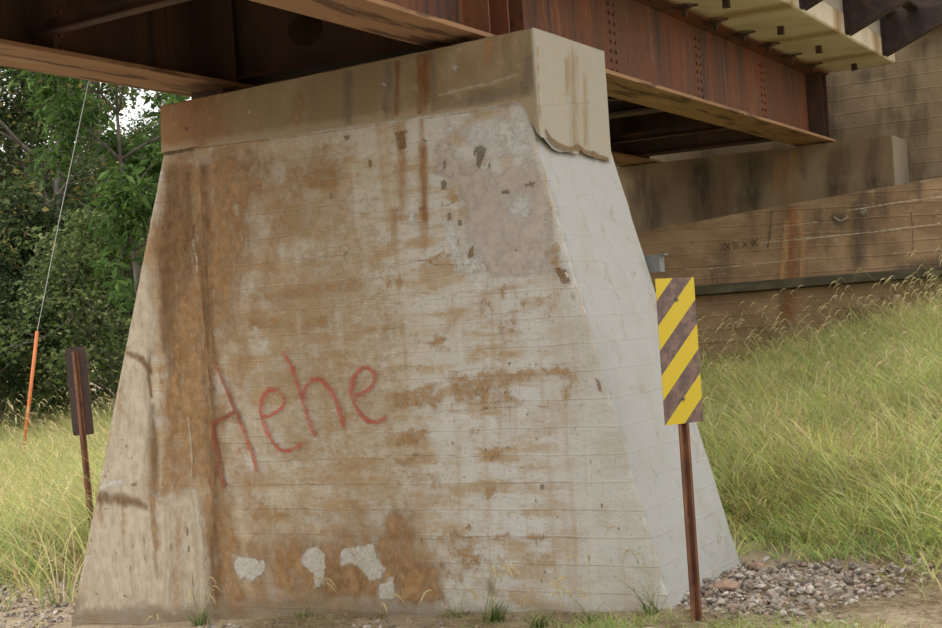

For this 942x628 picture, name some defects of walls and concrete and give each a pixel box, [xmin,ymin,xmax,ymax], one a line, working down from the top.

spalling [395,131,406,149]
spalling [474,145,490,168]
spalling [545,130,609,161]
spalling [441,161,462,246]
spalling [545,245,570,284]
leakage [97,154,486,606]
leakage [365,356,573,420]